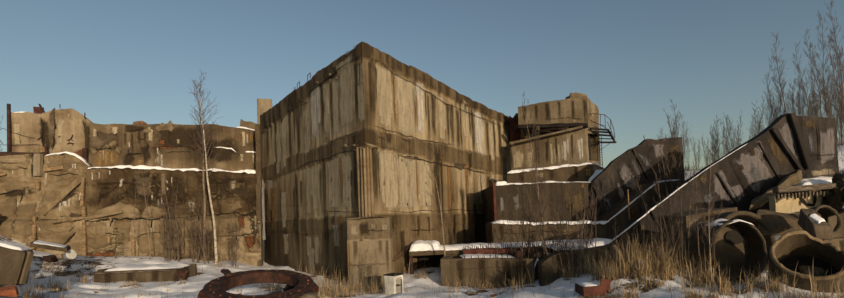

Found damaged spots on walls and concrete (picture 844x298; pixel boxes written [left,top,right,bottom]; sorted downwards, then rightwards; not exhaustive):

crack [0,162,78,228]
crack [11,119,75,150]
crack [96,128,190,157]
spalling [143,120,176,133]
leakage [91,125,256,212]
crack [61,183,316,261]
crack [263,56,505,237]
leakage [199,58,583,275]